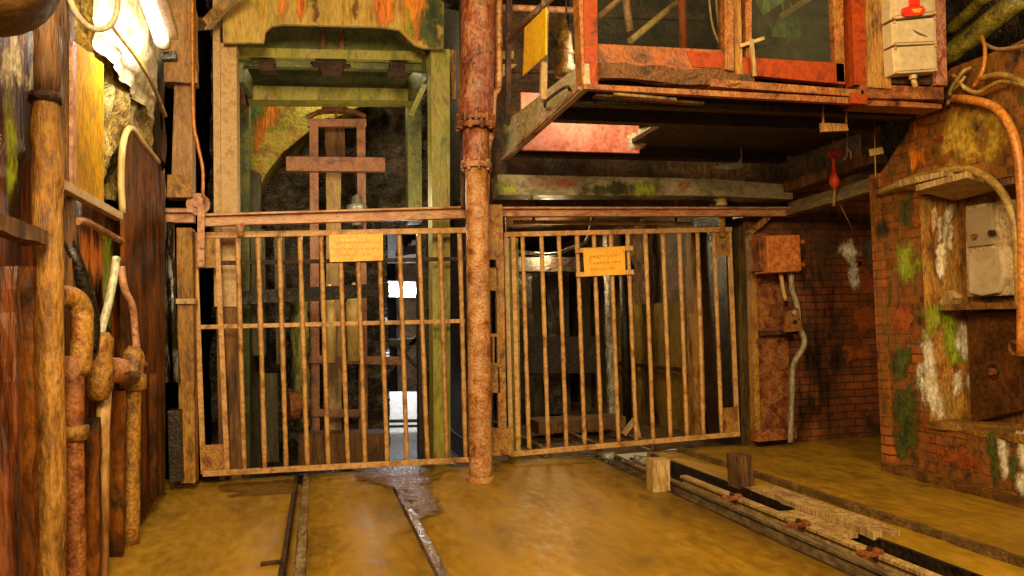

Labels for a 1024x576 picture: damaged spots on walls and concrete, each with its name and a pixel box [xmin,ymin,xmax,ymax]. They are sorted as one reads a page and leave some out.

damp [917,311,970,418]
damp [986,428,1024,494]